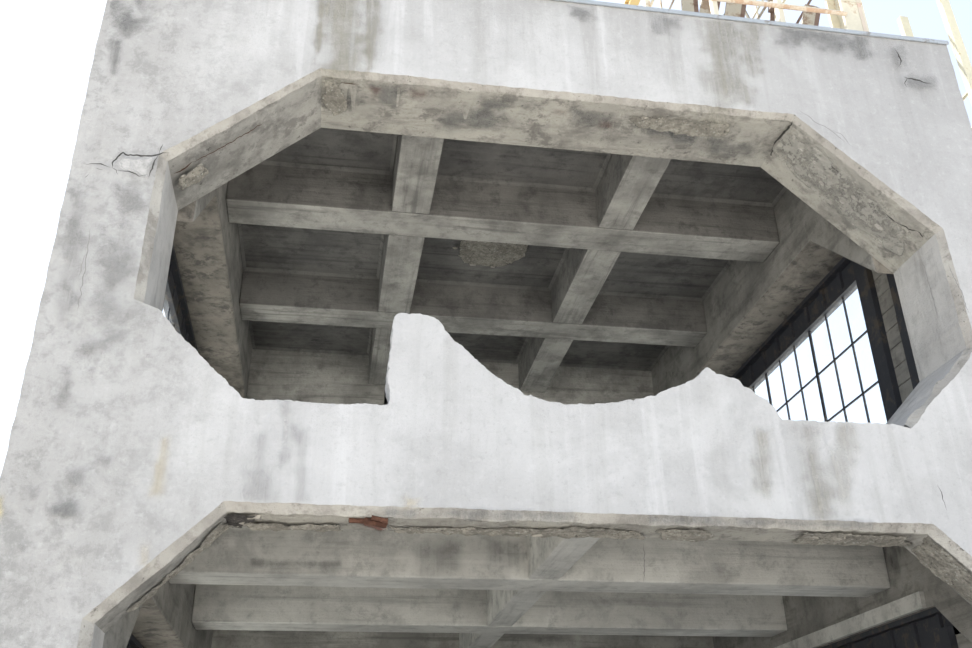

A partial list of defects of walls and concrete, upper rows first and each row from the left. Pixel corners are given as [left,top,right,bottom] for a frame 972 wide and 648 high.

crack [83,145,164,177]
spalling [177,163,209,190]
crack [176,125,260,173]
peeling [774,133,905,255]
spalling [452,240,528,268]
rust [348,515,388,531]
spalling [389,526,645,540]
spalling [792,532,972,601]